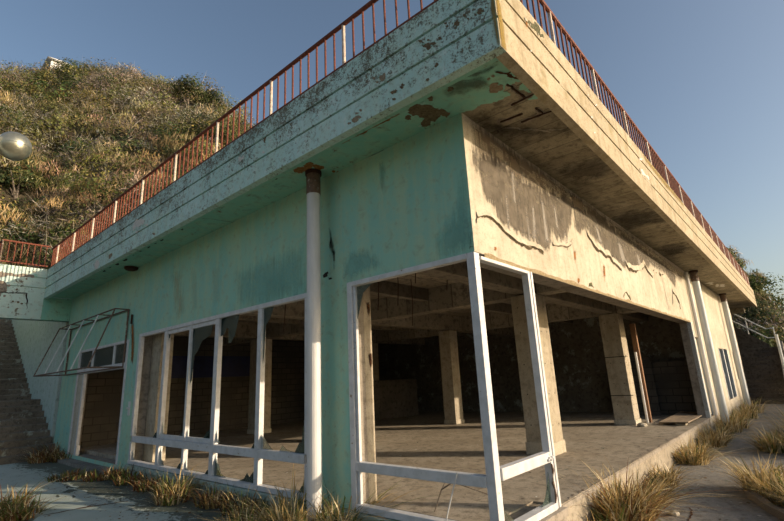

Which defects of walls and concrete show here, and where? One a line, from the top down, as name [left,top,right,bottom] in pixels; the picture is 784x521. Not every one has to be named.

crack [495,71,519,80]
peeling [405,96,450,127]
leakage [472,119,684,289]
crack [469,210,681,310]
peeling [0,271,38,304]